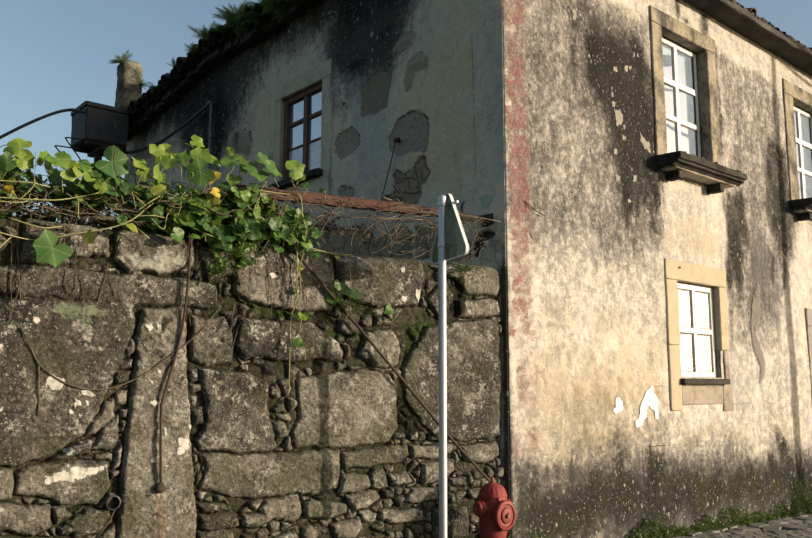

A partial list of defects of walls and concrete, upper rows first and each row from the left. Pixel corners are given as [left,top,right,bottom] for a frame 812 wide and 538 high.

damp [138,52,242,160]
flaking render [360,69,392,117]
flaking render [334,126,360,160]
flaking render [382,110,431,204]
damp [585,28,665,237]
flaking render [308,222,437,261]
flaking render [447,231,495,263]
damp [723,138,797,320]
peeling [613,397,624,414]
peeling [635,386,663,427]
damp [516,429,812,538]